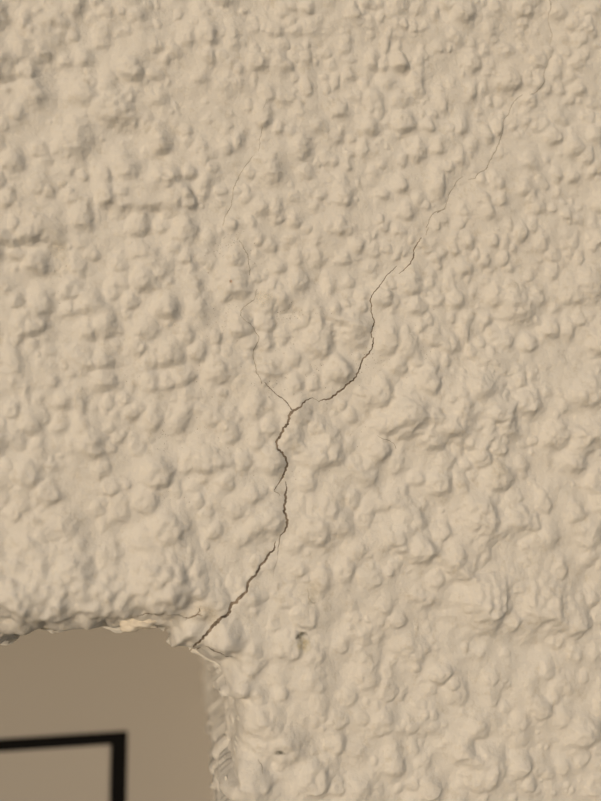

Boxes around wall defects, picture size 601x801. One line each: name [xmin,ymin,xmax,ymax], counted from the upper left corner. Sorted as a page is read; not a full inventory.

crack [140,1,552,657]